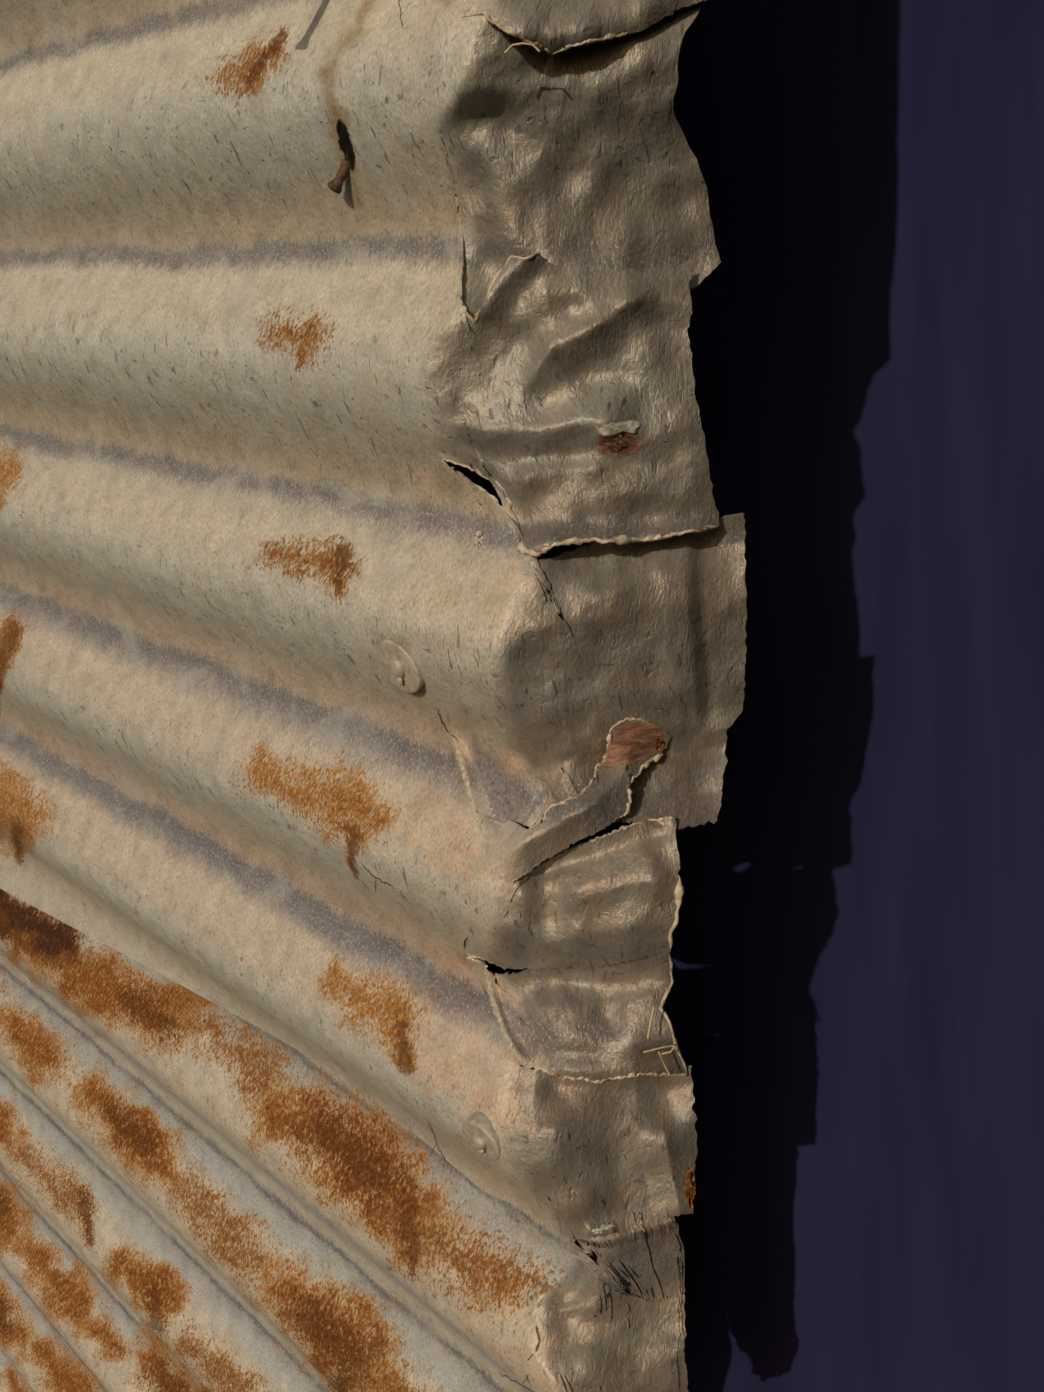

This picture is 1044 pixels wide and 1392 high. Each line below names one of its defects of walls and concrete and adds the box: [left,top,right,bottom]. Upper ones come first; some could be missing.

rust [205,24,291,100]
rust [253,302,340,372]
rust [0,440,29,511]
rust [256,530,364,605]
rust [0,608,31,695]
rust [0,733,566,1392]